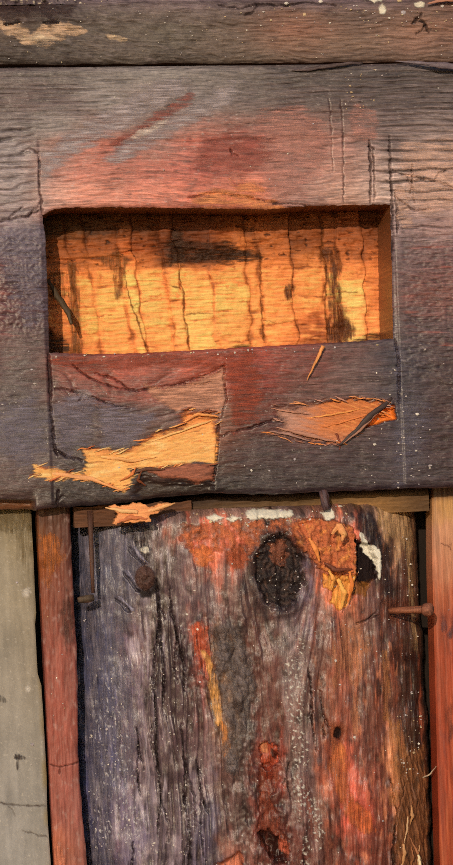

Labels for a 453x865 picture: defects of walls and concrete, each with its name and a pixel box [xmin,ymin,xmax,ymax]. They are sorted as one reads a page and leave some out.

crack [368,141,445,253]
peeling [145,370,225,413]
peeling [148,463,214,485]
crack [136,594,185,827]
crack [182,739,205,865]